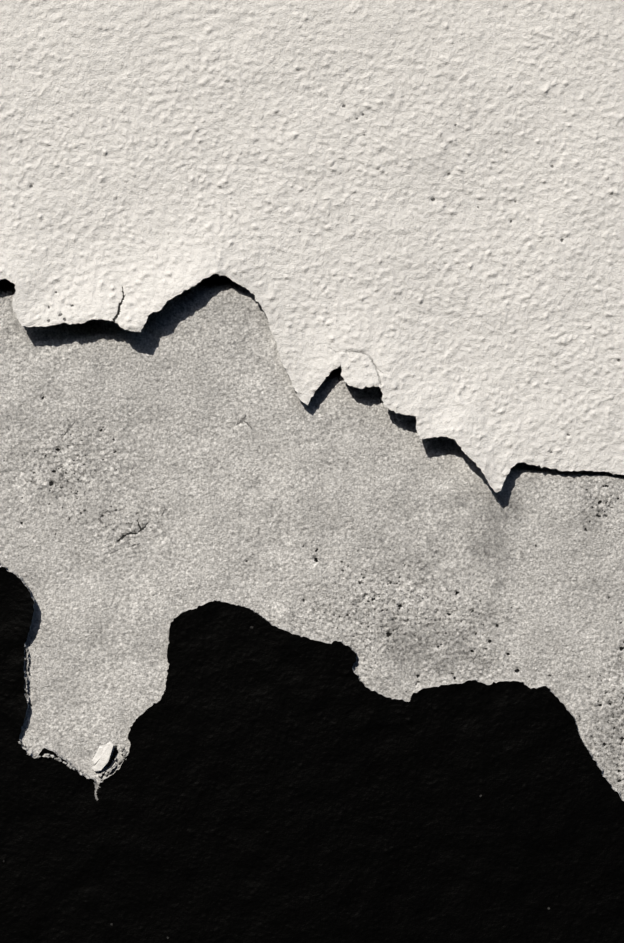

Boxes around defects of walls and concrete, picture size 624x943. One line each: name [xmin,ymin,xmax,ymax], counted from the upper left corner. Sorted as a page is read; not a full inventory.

crack [113,287,125,322]
peeling [0,274,624,801]